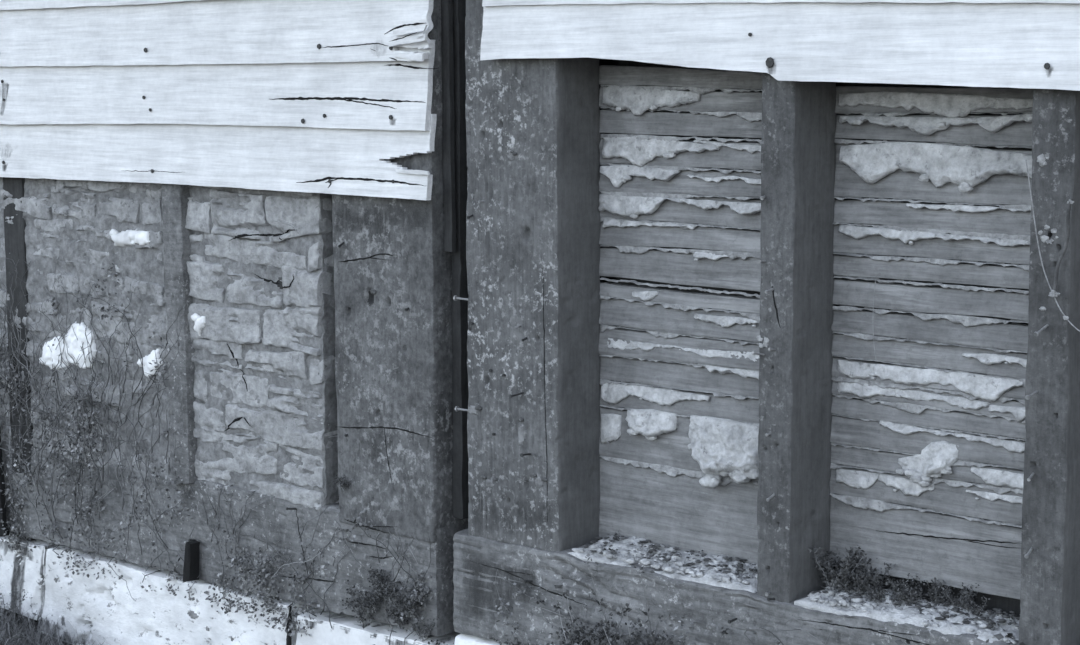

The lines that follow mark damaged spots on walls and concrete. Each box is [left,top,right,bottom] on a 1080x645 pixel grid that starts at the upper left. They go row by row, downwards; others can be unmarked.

crack [321,23,439,69]
crack [272,97,425,109]
crack [296,177,423,188]